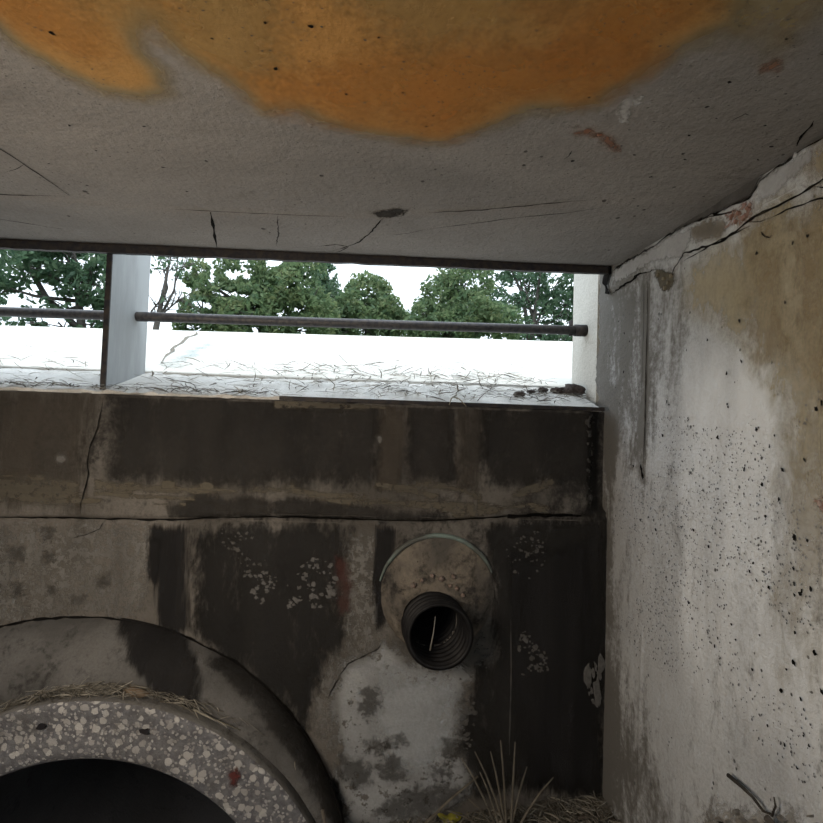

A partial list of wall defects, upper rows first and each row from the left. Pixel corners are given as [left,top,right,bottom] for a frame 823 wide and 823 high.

corrosion [0,0,808,142]
crack [0,149,70,196]
crack [209,212,217,247]
crack [325,220,381,252]
crack [602,121,823,294]
spalling [674,174,763,232]
damp [690,198,823,495]
crack [0,398,582,538]
damp [0,392,607,823]